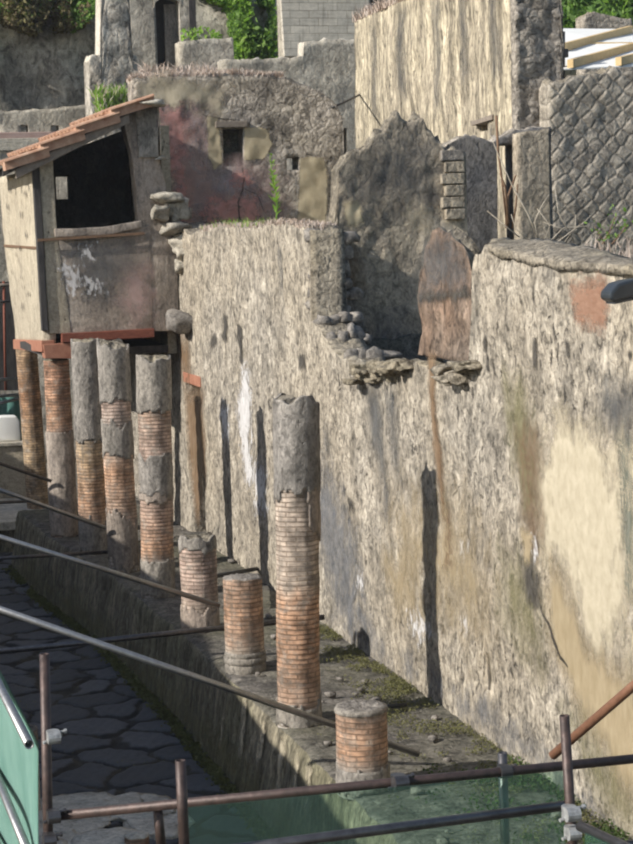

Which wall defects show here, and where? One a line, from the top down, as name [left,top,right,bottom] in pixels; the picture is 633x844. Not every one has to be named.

flaking render [57,244,109,298]
crack [539,604,568,668]